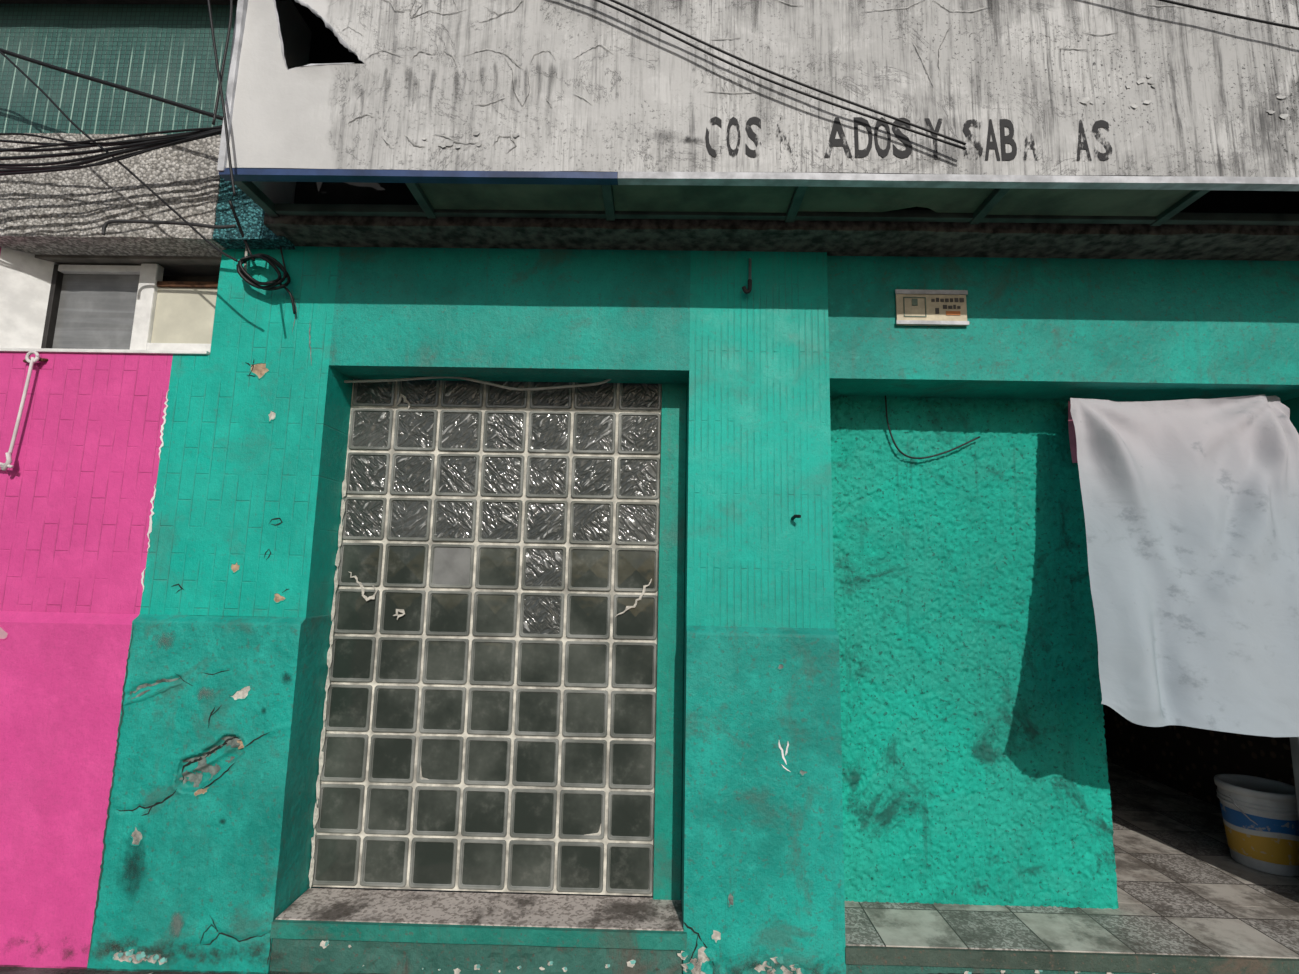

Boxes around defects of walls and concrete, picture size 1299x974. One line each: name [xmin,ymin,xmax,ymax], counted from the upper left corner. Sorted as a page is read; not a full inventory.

spalling [123,677,182,705]
peeling [229,686,251,701]
crack [117,733,268,816]
spalling [175,734,245,797]
peeling [113,949,167,965]
crack [200,916,271,964]
crack [683,922,714,965]
peeling [677,929,721,974]
peeling [754,957,807,974]